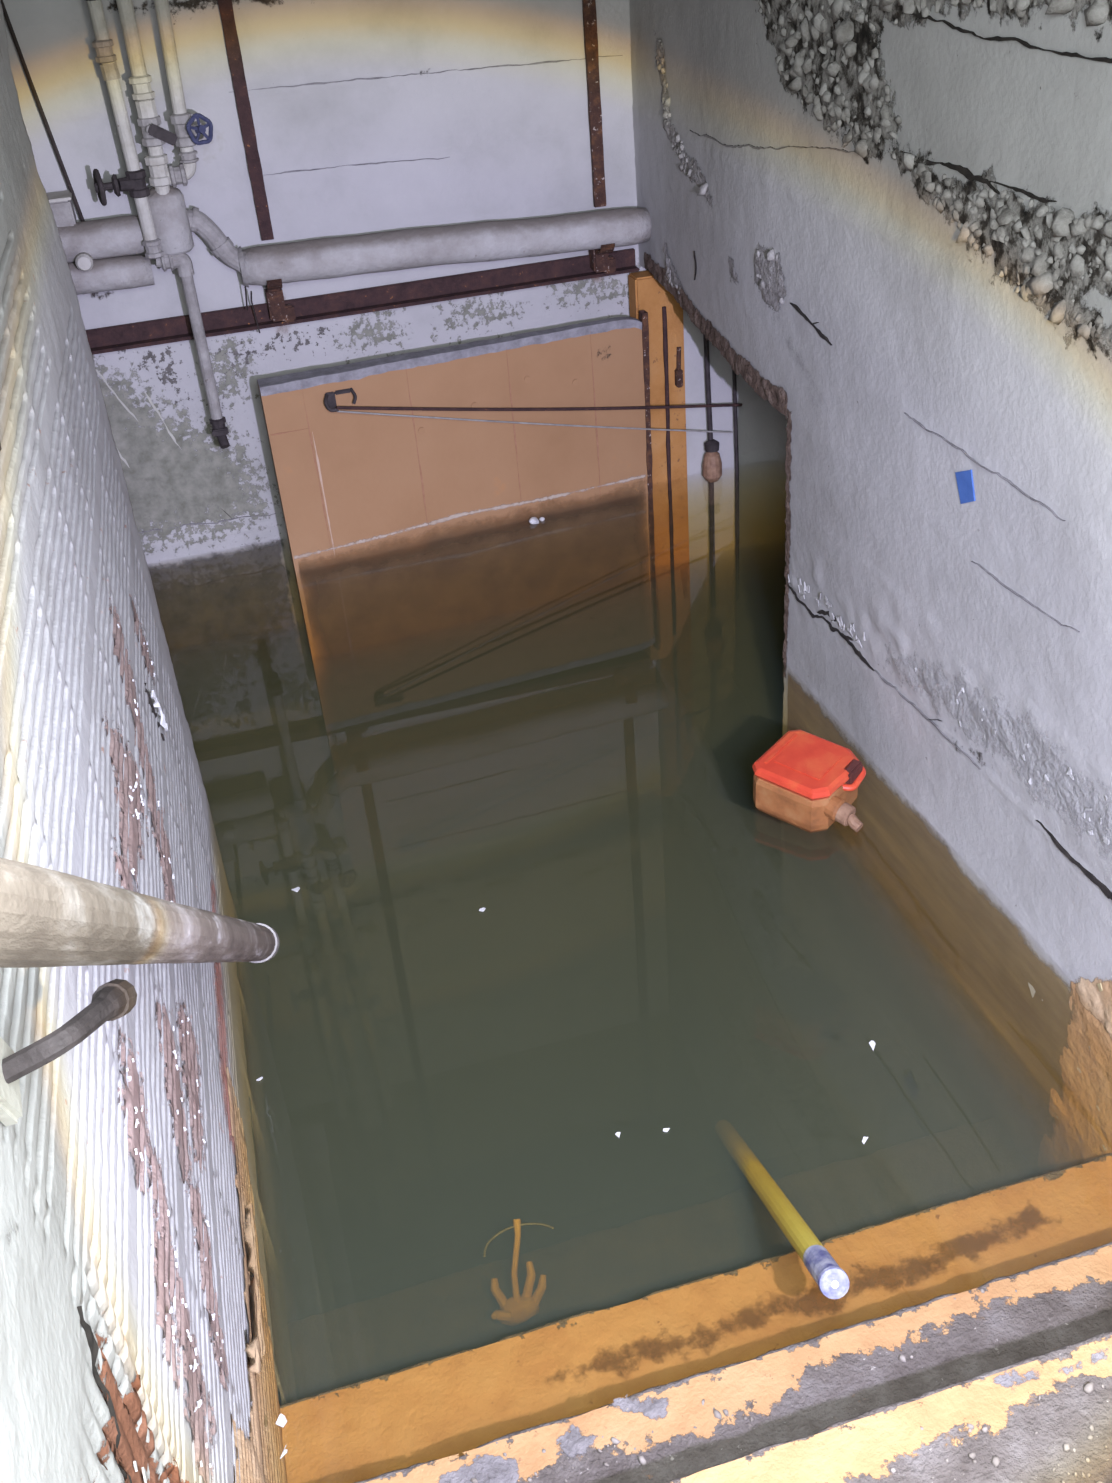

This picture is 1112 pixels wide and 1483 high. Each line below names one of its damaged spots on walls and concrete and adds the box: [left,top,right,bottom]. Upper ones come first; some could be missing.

crack [901,9,1112,63]
flaking render [764,0,1112,342]
crack [901,151,1057,203]
peeling [118,346,200,410]
peeling [214,325,339,409]
crack [904,412,1066,521]
crack [971,561,1080,632]
crack [1036,820,1112,900]
rust [214,962,234,1145]
peeling [93,997,287,1483]
peeling [583,1208,1051,1375]
peeling [612,1394,669,1420]